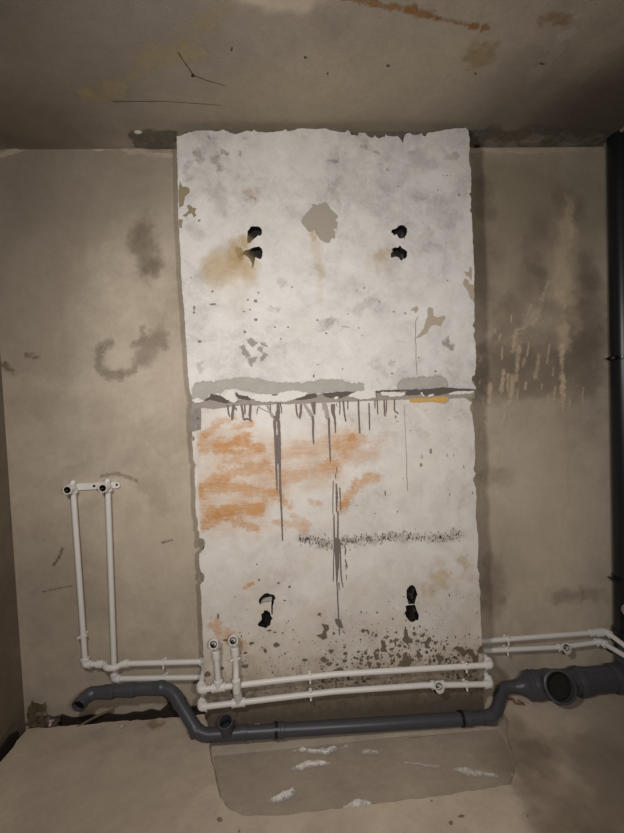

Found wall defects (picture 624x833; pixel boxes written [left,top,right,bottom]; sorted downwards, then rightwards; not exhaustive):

rust [355,0,441,20]
peeling [301,202,338,243]
peeling [404,306,446,338]
damp [479,209,577,440]
damp [227,402,283,541]
damp [295,399,460,635]
damp [454,645,483,663]